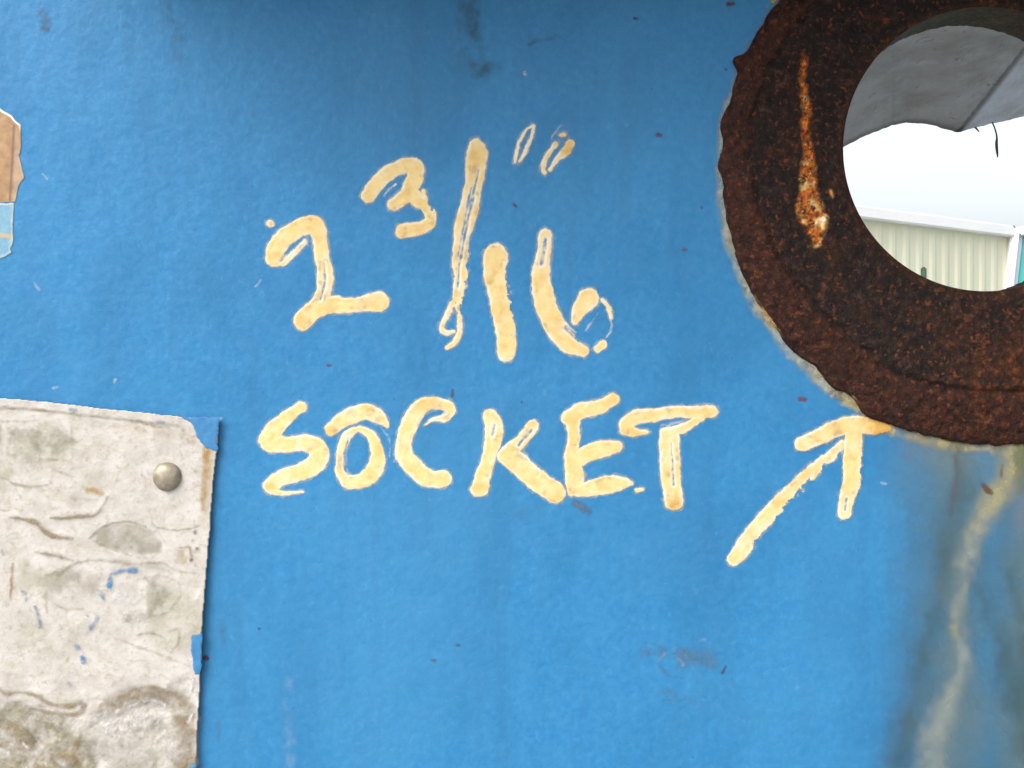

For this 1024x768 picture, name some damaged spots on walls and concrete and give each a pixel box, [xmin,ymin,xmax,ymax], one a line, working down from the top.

corrosion [796,56,834,244]
leakage [913,439,1024,768]